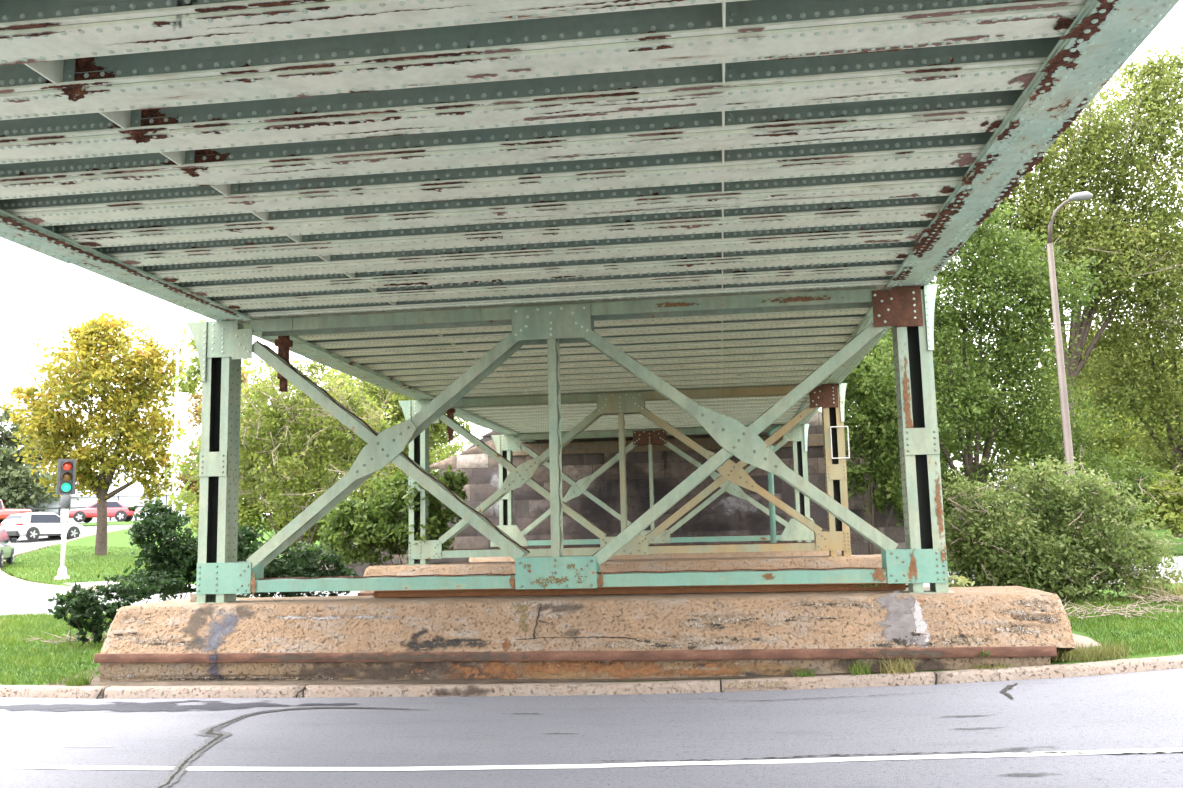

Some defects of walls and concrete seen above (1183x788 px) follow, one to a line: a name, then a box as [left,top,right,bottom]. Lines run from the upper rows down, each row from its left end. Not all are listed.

rust [33,57,115,102]
rust [114,0,471,45]
rust [220,45,531,83]
rust [752,0,1119,94]
rust [0,149,230,187]
rust [108,80,753,198]
rust [583,119,1020,283]
rust [750,107,974,167]
rust [974,98,1089,227]
rust [0,215,241,317]
damp [181,604,254,680]
damp [256,629,528,696]